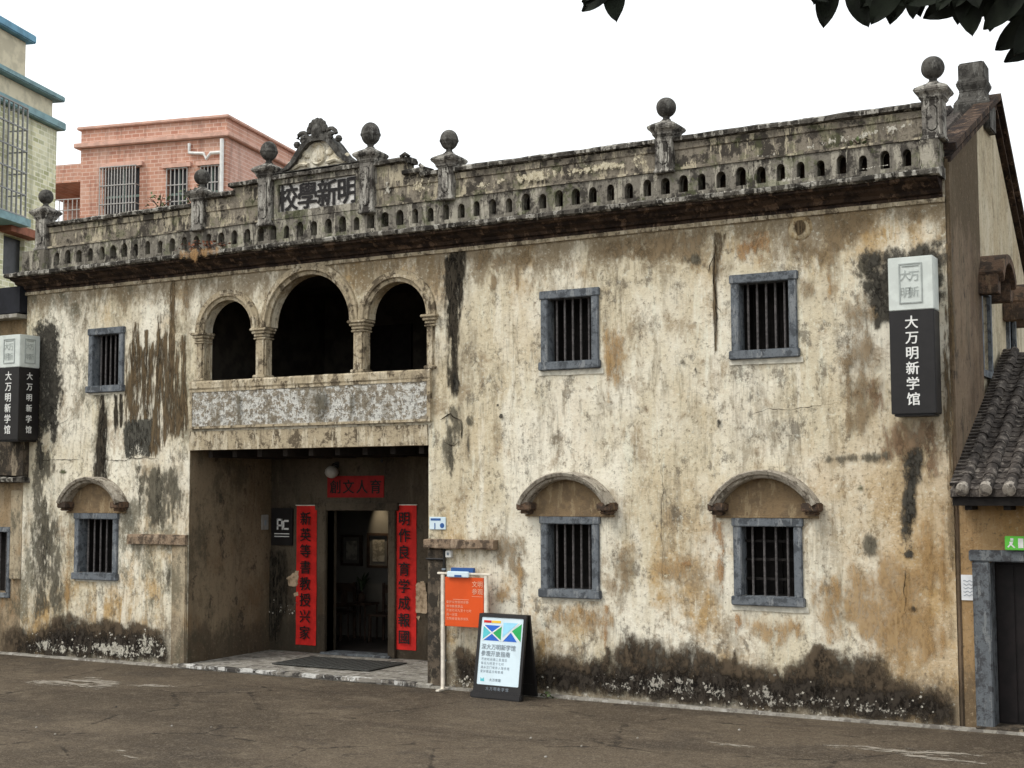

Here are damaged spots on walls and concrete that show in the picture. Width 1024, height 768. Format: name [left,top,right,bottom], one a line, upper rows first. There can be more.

water stain [1,319,167,661]
water stain [93,280,189,529]
water stain [438,247,529,476]
water stain [535,239,956,724]
water stain [453,646,476,683]